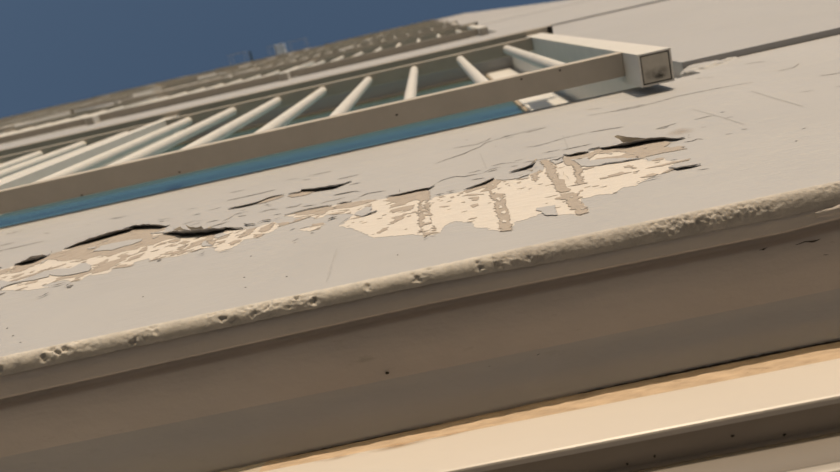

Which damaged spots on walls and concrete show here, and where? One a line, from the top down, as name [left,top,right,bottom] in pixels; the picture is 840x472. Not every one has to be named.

peeling [0,135,701,297]
spalling [0,181,840,376]
crack [815,205,840,218]